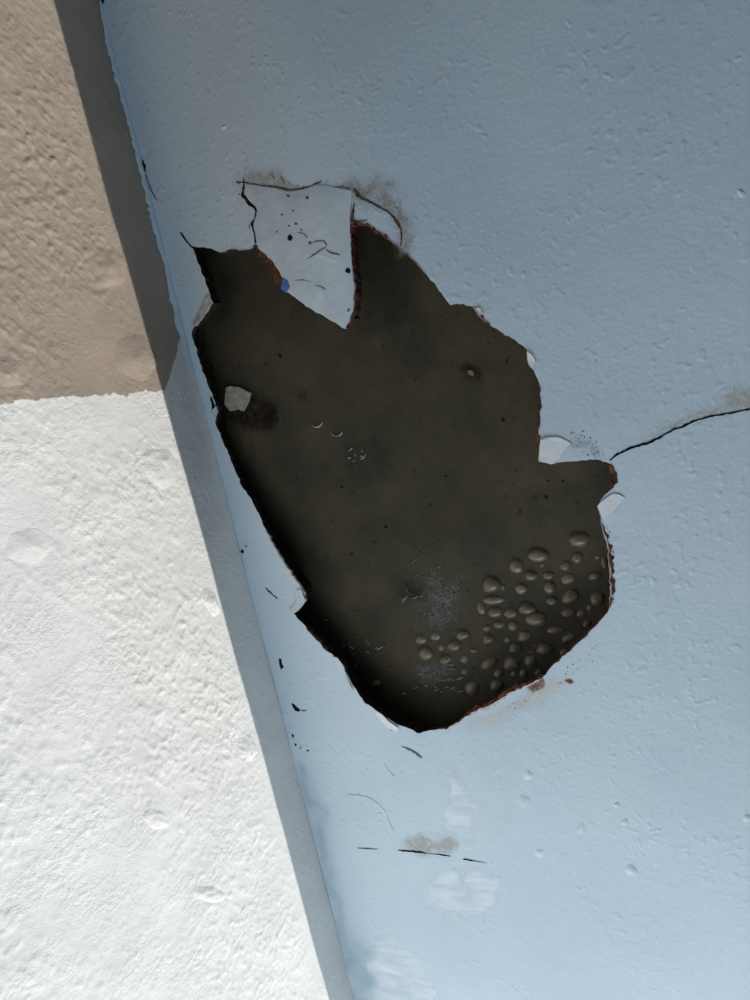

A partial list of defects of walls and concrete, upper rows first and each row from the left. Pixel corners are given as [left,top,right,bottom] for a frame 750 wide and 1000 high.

crack [236,174,402,246]
spalling [192,184,625,733]
crack [610,408,750,461]
crack [358,848,484,863]